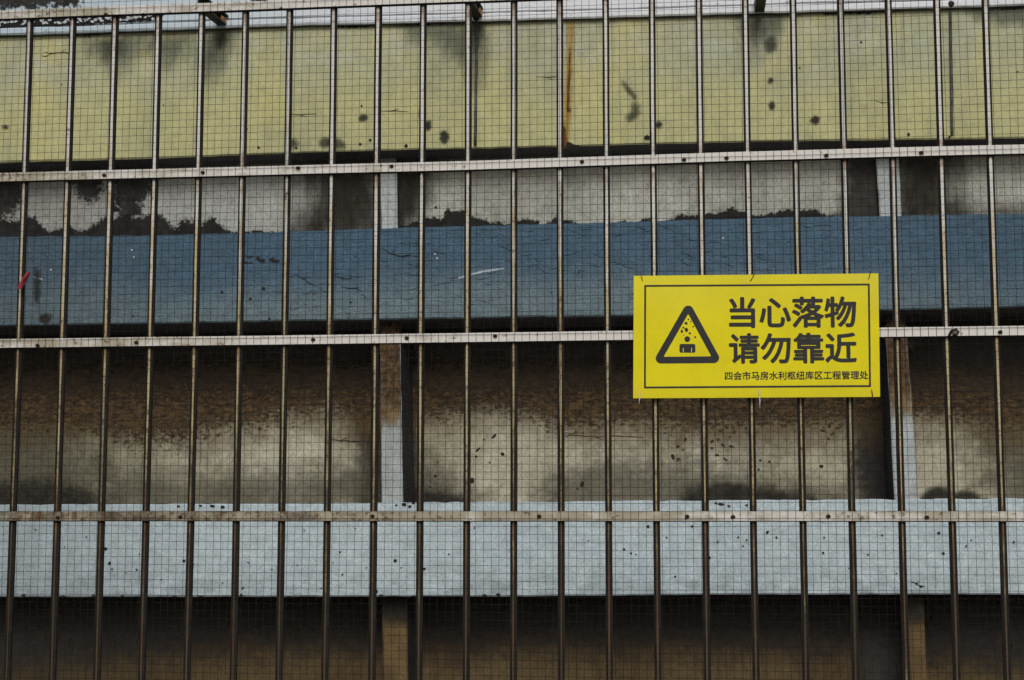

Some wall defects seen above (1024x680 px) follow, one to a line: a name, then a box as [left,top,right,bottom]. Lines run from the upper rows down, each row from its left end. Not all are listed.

corrosion [563,22,574,146]
damp [625,85,639,120]
damp [0,172,21,217]
damp [72,169,159,220]
damp [292,161,382,231]
damp [0,314,1024,505]